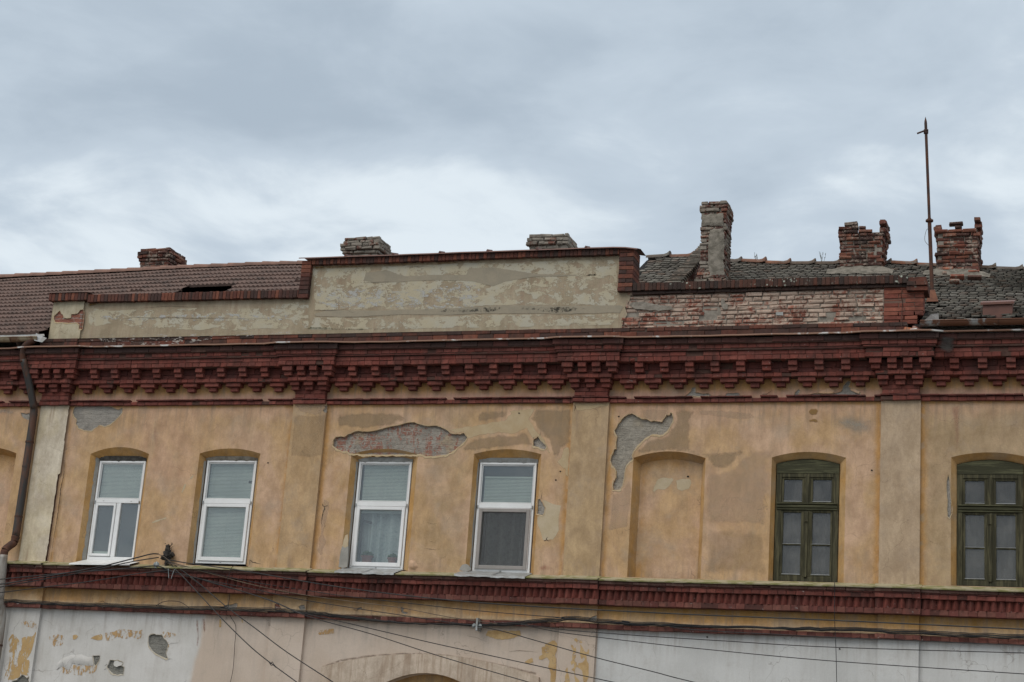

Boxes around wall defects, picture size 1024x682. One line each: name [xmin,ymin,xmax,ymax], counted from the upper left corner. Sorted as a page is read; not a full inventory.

peeling [53,260,884,345]
flaking render [72,406,123,432]
flaking render [332,409,550,459]
flaking render [610,412,674,492]
peeling [4,621,36,682]
flaking render [62,655,124,676]
flaking render [92,629,175,660]